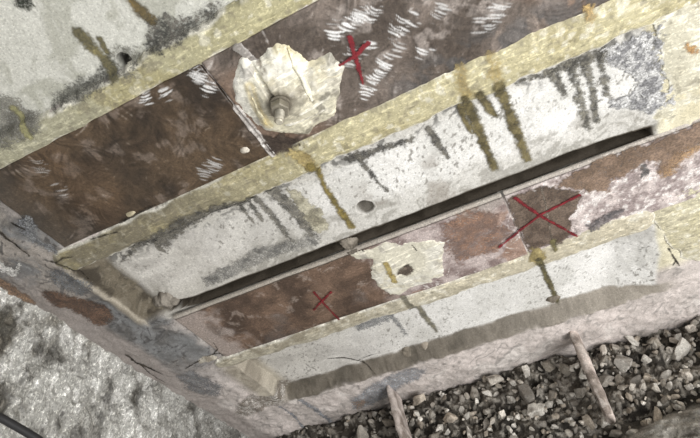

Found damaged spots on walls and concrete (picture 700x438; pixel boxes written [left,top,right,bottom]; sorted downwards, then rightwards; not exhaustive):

water stain [457,66,532,171]
water stain [515,45,611,130]
water stain [285,148,356,229]
corrosion [41,291,114,326]
water stain [529,247,560,303]
crack [126,355,164,382]